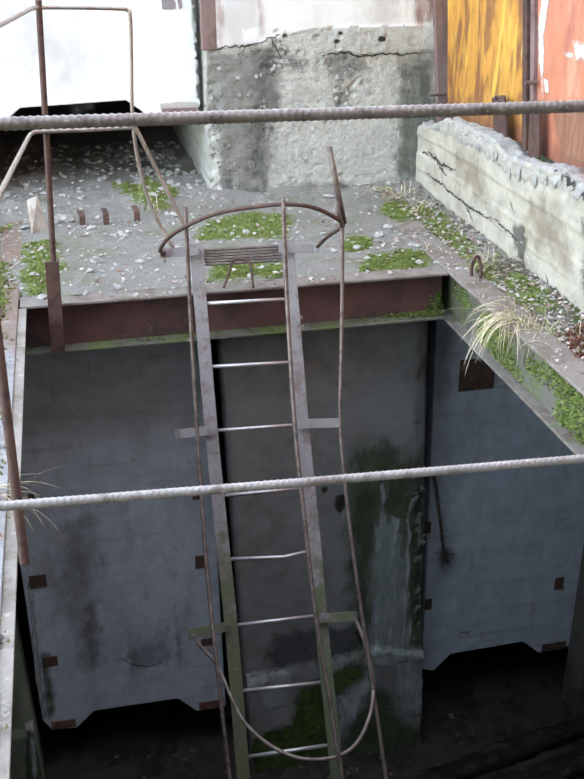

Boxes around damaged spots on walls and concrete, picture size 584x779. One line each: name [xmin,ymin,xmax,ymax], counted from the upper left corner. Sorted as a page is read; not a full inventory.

crack [213,34,281,58]
spalling [211,40,305,111]
spalling [321,54,362,107]
crack [322,50,410,58]
spalling [211,122,266,191]
crack [422,151,517,240]
leakage [328,484,421,658]
leakage [258,630,319,709]
leakage [395,662,422,716]